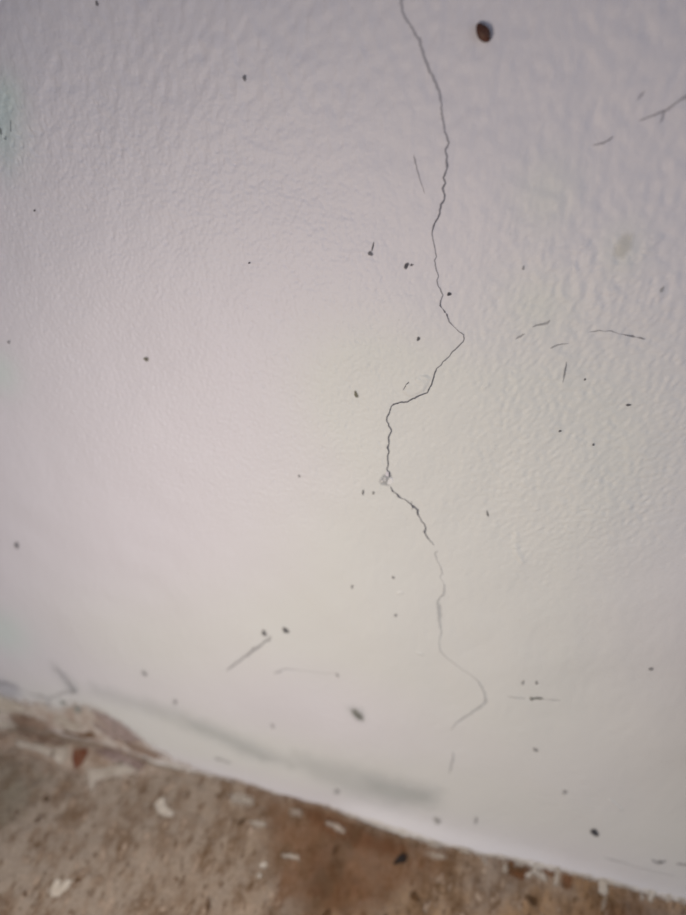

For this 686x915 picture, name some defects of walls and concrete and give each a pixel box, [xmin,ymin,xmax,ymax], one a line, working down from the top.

crack [432,154,448,231]
crack [386,300,464,544]